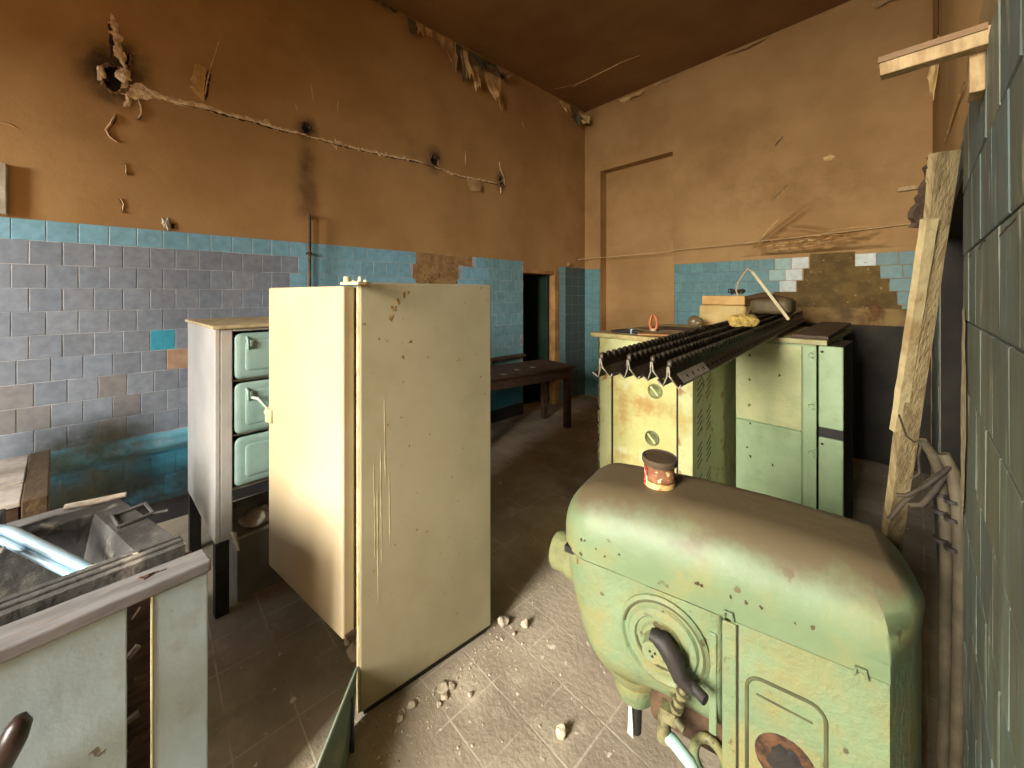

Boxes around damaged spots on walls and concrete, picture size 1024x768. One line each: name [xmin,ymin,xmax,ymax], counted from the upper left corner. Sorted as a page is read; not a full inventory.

flaking render [96,13,162,142]
crack [124,35,498,193]
peeling [373,0,514,111]
peeling [559,100,590,127]
peeling [413,252,472,284]
peeling [773,252,907,326]